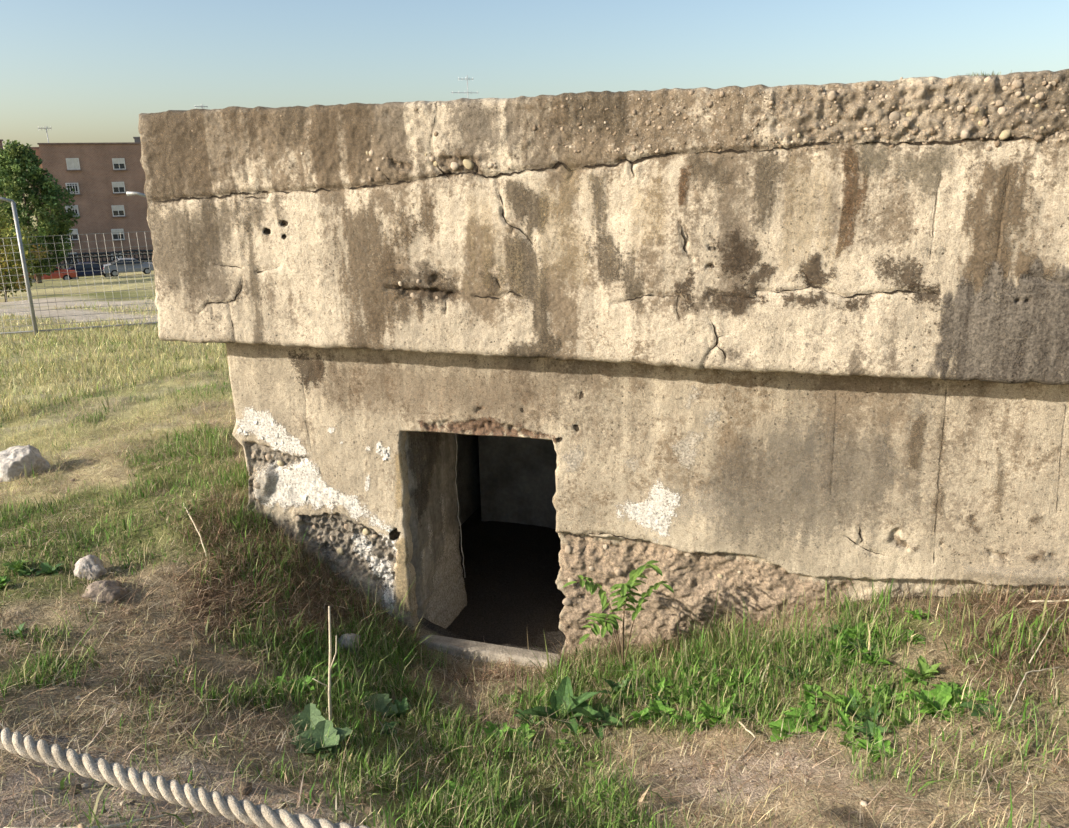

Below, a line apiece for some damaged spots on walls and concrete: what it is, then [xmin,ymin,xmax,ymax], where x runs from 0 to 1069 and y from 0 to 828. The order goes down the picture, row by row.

leakage [564,91,627,152]
crack [154,102,1069,245]
spalling [526,76,1069,155]
leakage [147,193,266,345]
crack [201,264,280,339]
leakage [333,198,434,351]
leakage [503,179,561,360]
crack [703,320,726,369]
crack [710,272,938,299]
leakage [928,143,1069,385]
peeling [236,407,401,614]
spalling [559,531,854,654]